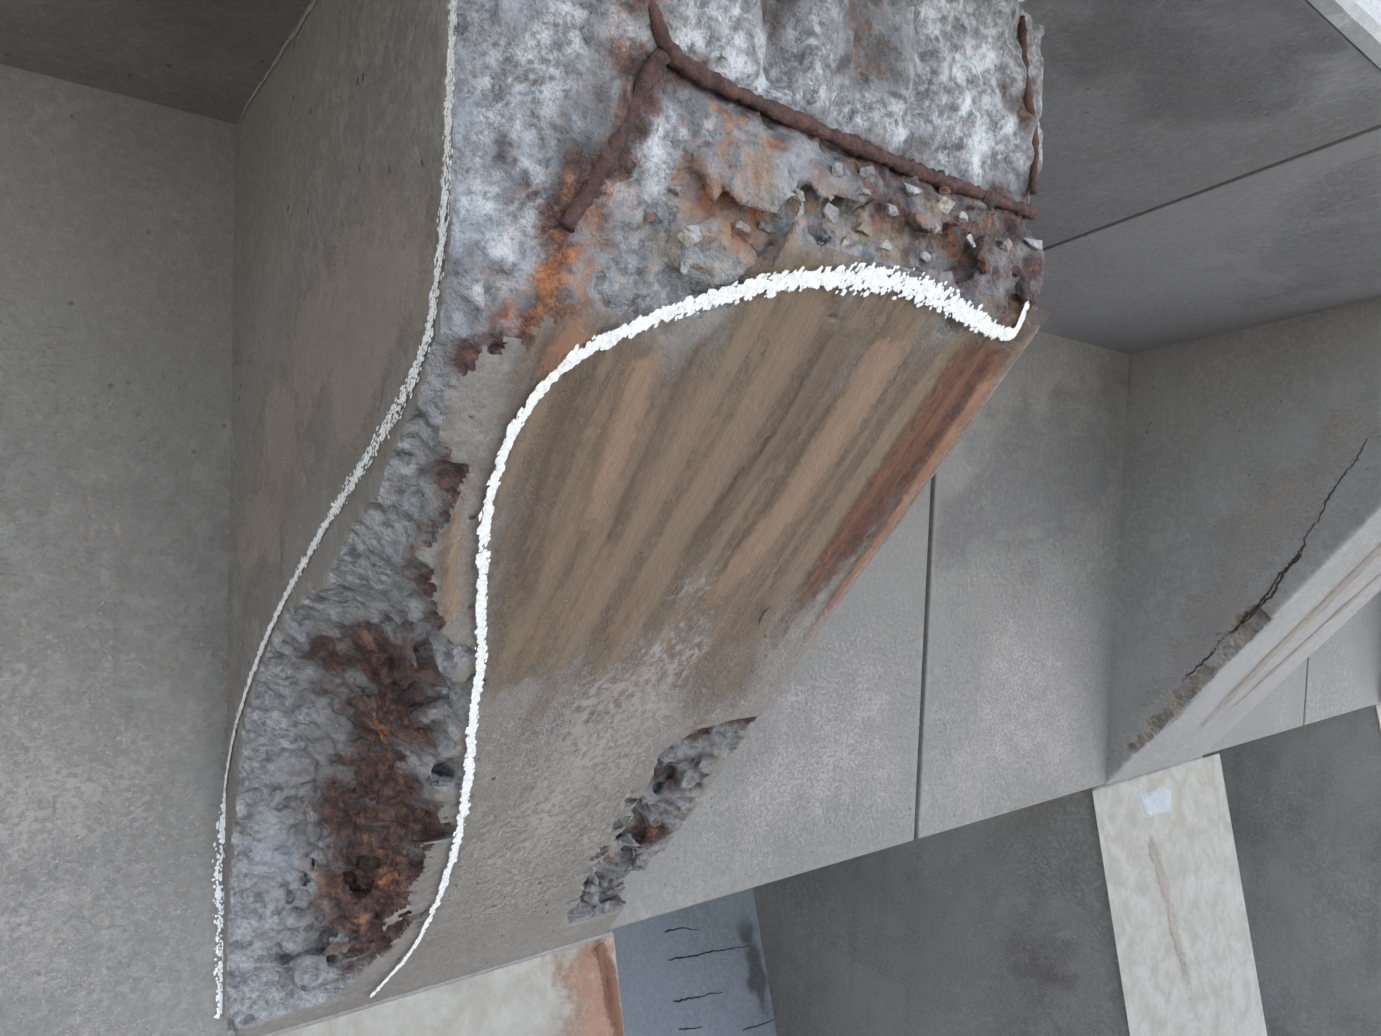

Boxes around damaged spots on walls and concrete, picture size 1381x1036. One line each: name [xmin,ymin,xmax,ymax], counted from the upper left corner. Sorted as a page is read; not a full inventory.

rust [439,486,464,618]
spalling [224,0,1045,1036]
rust [487,243,1036,729]
crack [1181,433,1372,683]
rust [558,938,624,1036]